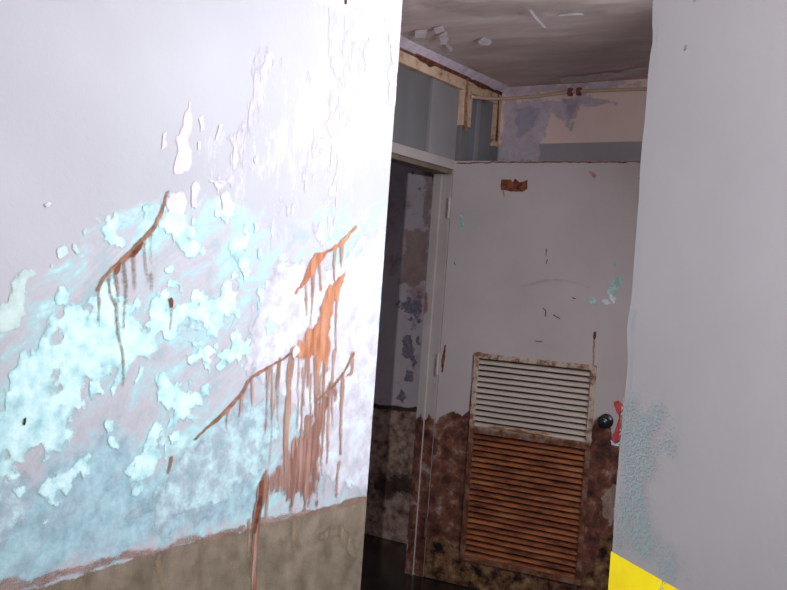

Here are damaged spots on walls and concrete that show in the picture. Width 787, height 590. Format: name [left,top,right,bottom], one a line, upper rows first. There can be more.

peeling [83,213,126,248]
peeling [161,102,204,175]
peeling [159,181,206,259]
peeling [349,0,480,111]
rust [416,53,502,142]
rust [501,179,527,197]
peeling [498,80,647,161]
rust [96,190,169,387]
peeling [0,223,385,541]
rust [195,226,357,590]
peeling [395,291,424,403]
rust [405,386,621,590]